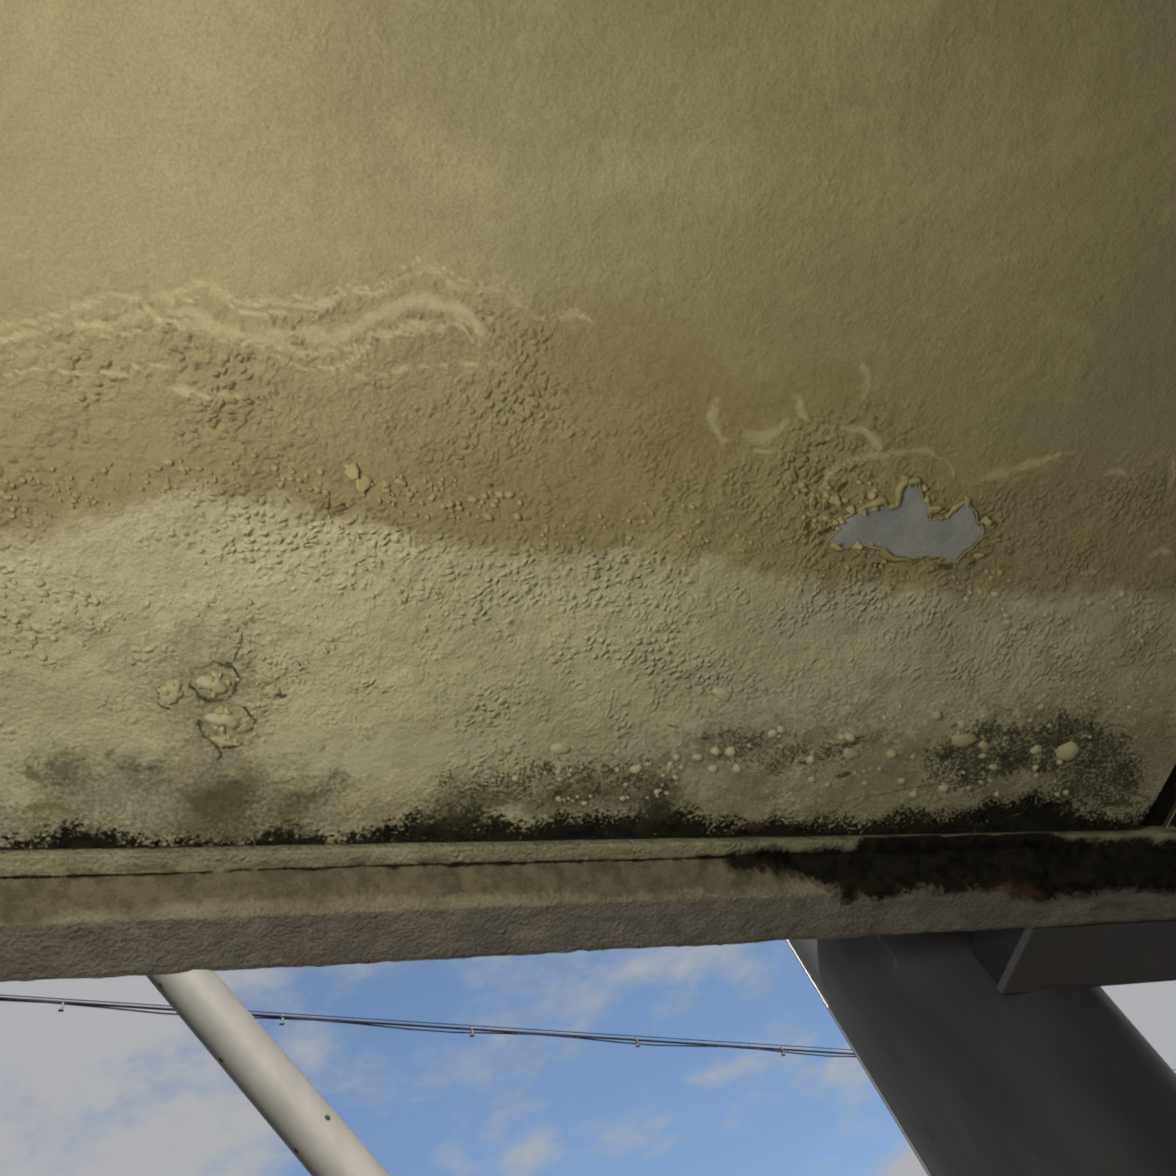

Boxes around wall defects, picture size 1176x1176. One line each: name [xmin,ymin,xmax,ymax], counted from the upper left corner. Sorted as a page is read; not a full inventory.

water stain [0,280,1176,905]
peeling [802,475,993,570]